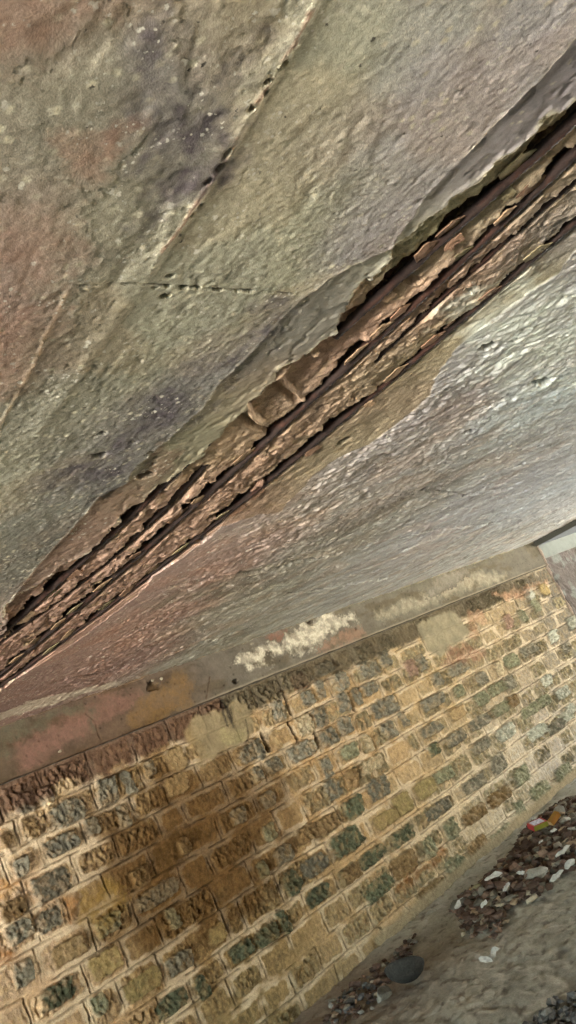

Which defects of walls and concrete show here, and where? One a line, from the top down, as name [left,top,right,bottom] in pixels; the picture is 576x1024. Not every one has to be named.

crack [301,0,321,30]
crack [252,53,291,109]
crack [62,203,295,300]
crack [0,338,48,429]
spalling [0,39,576,690]
damp [228,564,509,678]
damp [0,675,129,762]
damp [218,698,255,749]
damp [36,776,82,817]
damp [0,831,32,869]
damp [66,812,212,950]